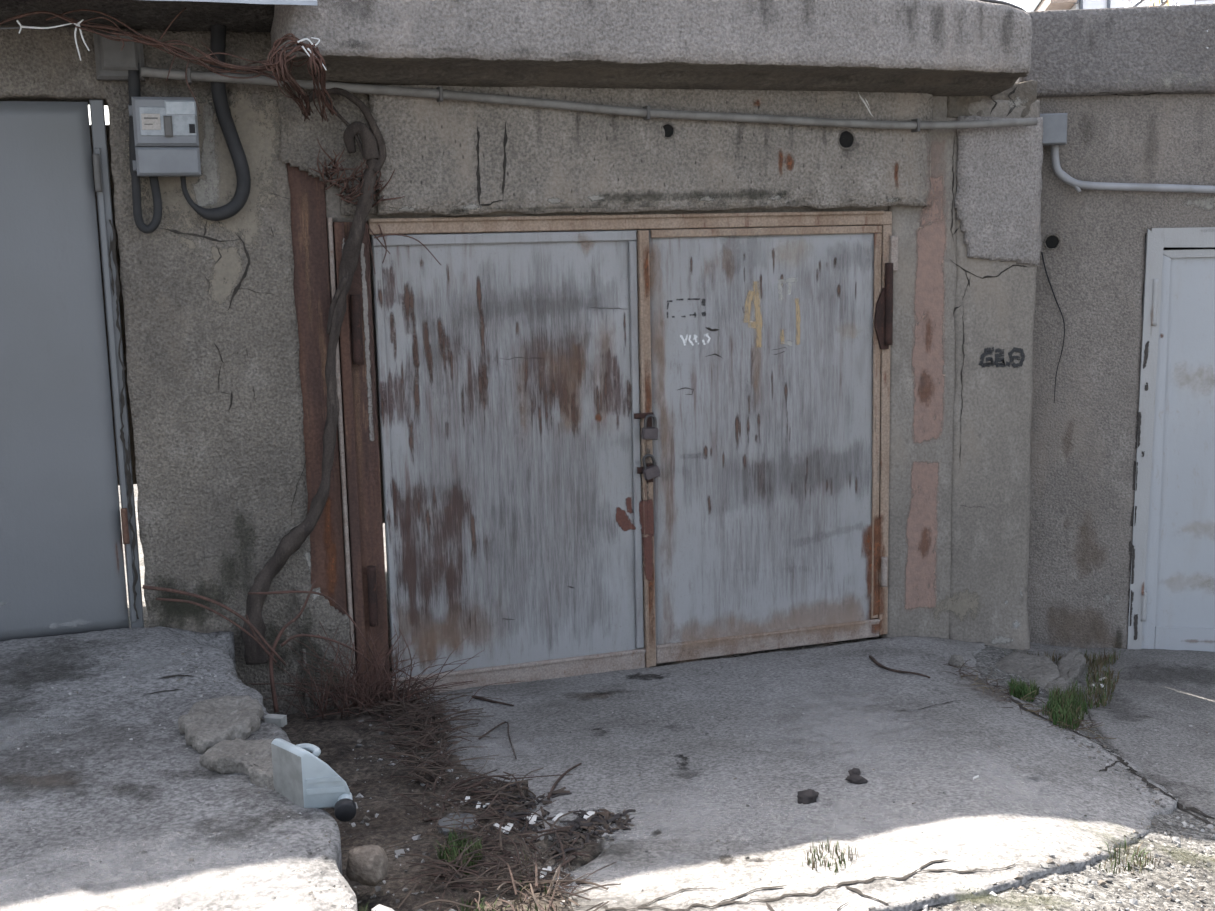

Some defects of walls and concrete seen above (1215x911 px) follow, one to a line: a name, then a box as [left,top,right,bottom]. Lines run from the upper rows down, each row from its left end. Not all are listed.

spalling [947,80,1038,118]
crack [476,122,508,206]
crack [161,222,274,310]
corrosion [378,278,498,461]
corrosion [516,323,582,438]
corrosion [594,351,651,427]
corrosion [735,397,771,493]
corrosion [387,480,397,540]
corrosion [862,516,884,633]
crack [1009,697,1215,826]
crack [561,858,1027,911]